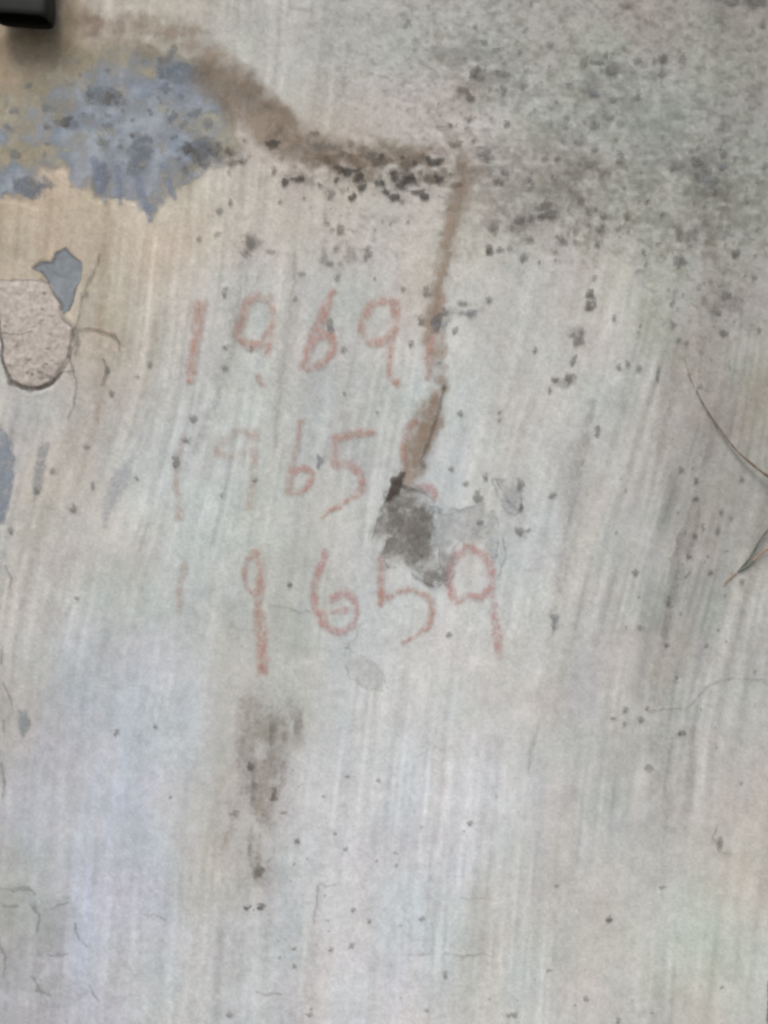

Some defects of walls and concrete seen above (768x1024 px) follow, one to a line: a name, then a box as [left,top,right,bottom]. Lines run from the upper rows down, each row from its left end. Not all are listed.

peeling [0,42,241,221]
leakage [199,47,473,209]
flaking render [0,248,82,391]
peeling [374,472,452,586]